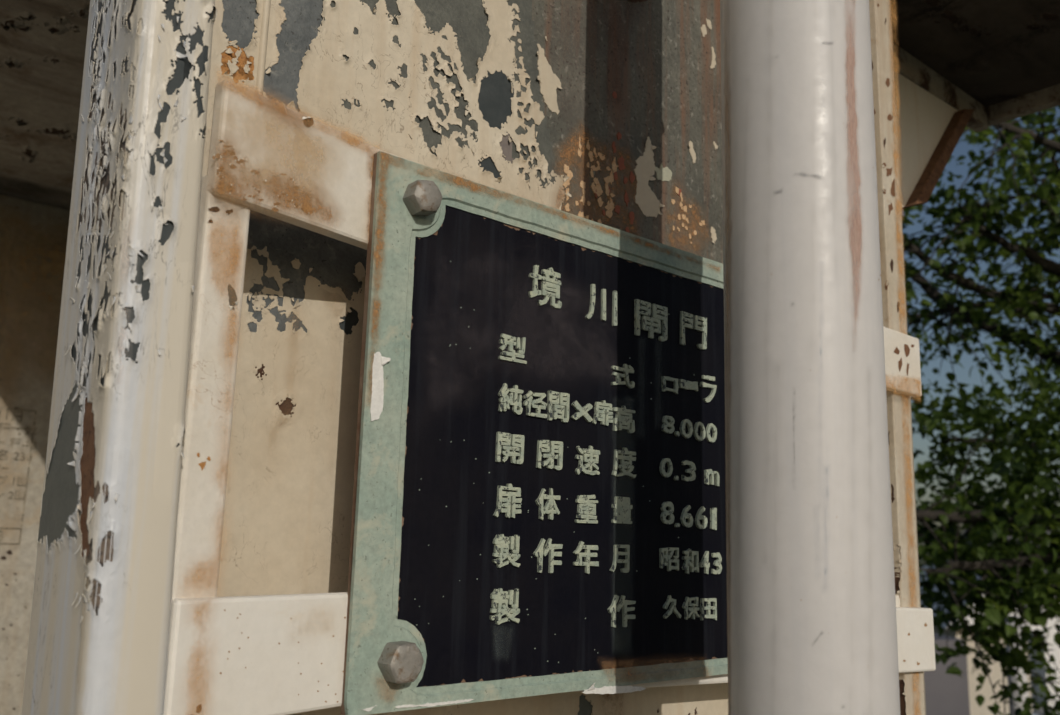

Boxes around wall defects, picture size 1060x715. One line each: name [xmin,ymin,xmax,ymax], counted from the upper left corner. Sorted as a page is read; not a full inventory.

peeling [360,0,401,48]
peeling [154,196,174,246]
corrosion [207,149,258,223]
peeling [149,0,336,176]
peeling [212,140,367,335]
corrosion [271,178,332,220]
corrosion [342,131,363,146]
corrosion [448,174,510,196]
peeling [381,0,723,264]
corrosion [560,131,654,248]
corrosion [846,34,862,292]
peeling [0,0,150,623]